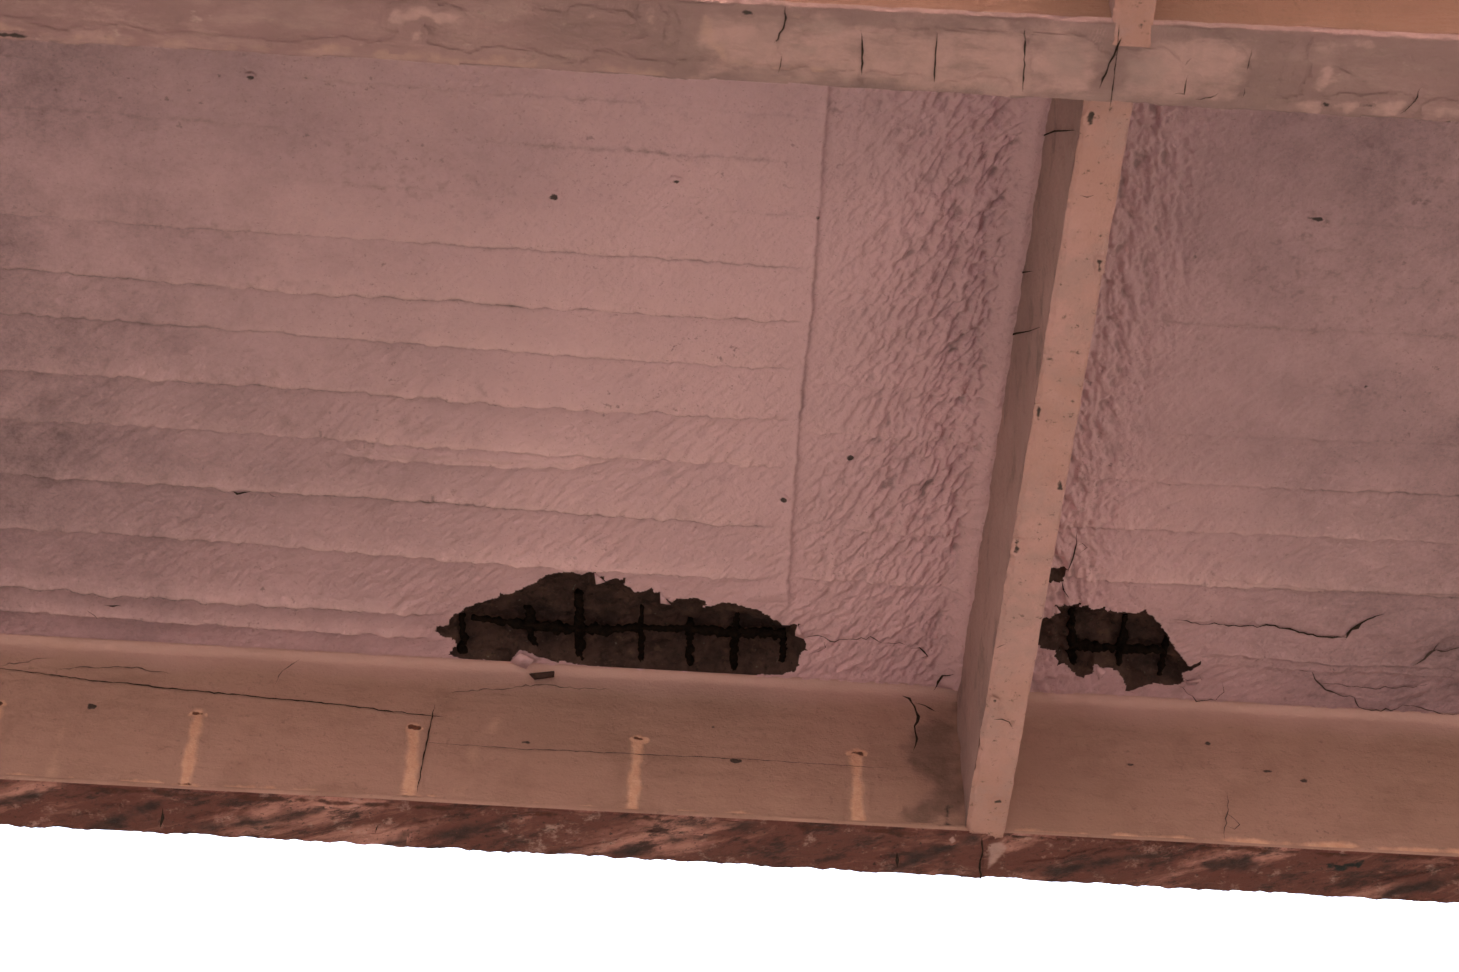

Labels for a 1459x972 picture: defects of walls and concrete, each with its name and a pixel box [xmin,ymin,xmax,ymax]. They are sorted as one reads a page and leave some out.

crack [774,10,787,73]
crack [1099,30,1122,105]
spalling [436,572,808,680]
spalling [1038,603,1201,691]
crack [1182,613,1385,639]
crack [1300,642,1457,715]